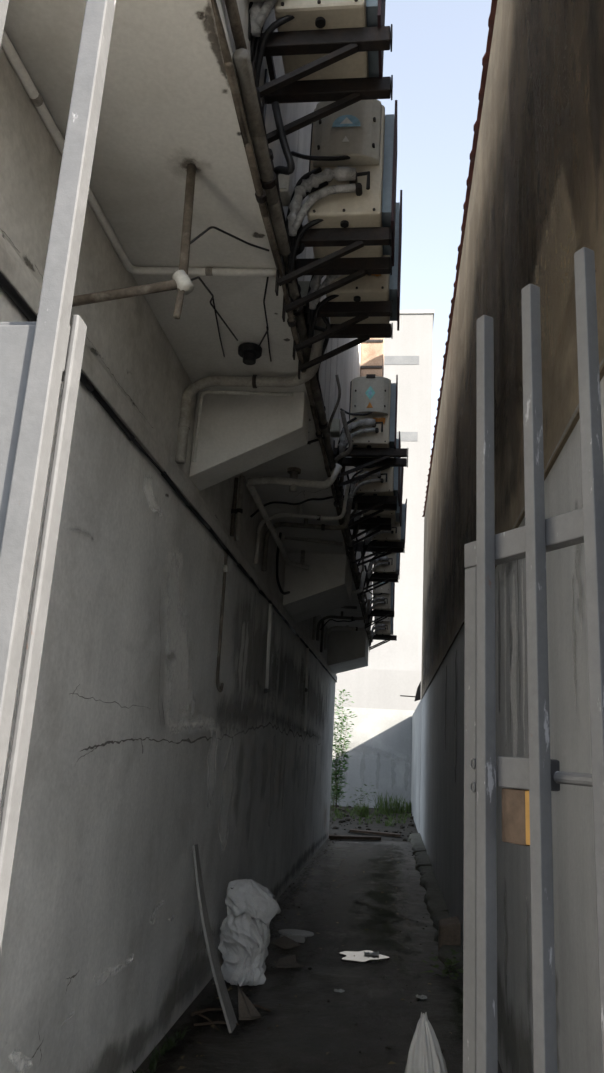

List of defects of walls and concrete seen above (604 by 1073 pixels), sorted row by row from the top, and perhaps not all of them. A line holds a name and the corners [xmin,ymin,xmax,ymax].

damp [422,0,604,705]
crack [70,615,321,760]
damp [208,595,329,845]
damp [497,559,526,757]